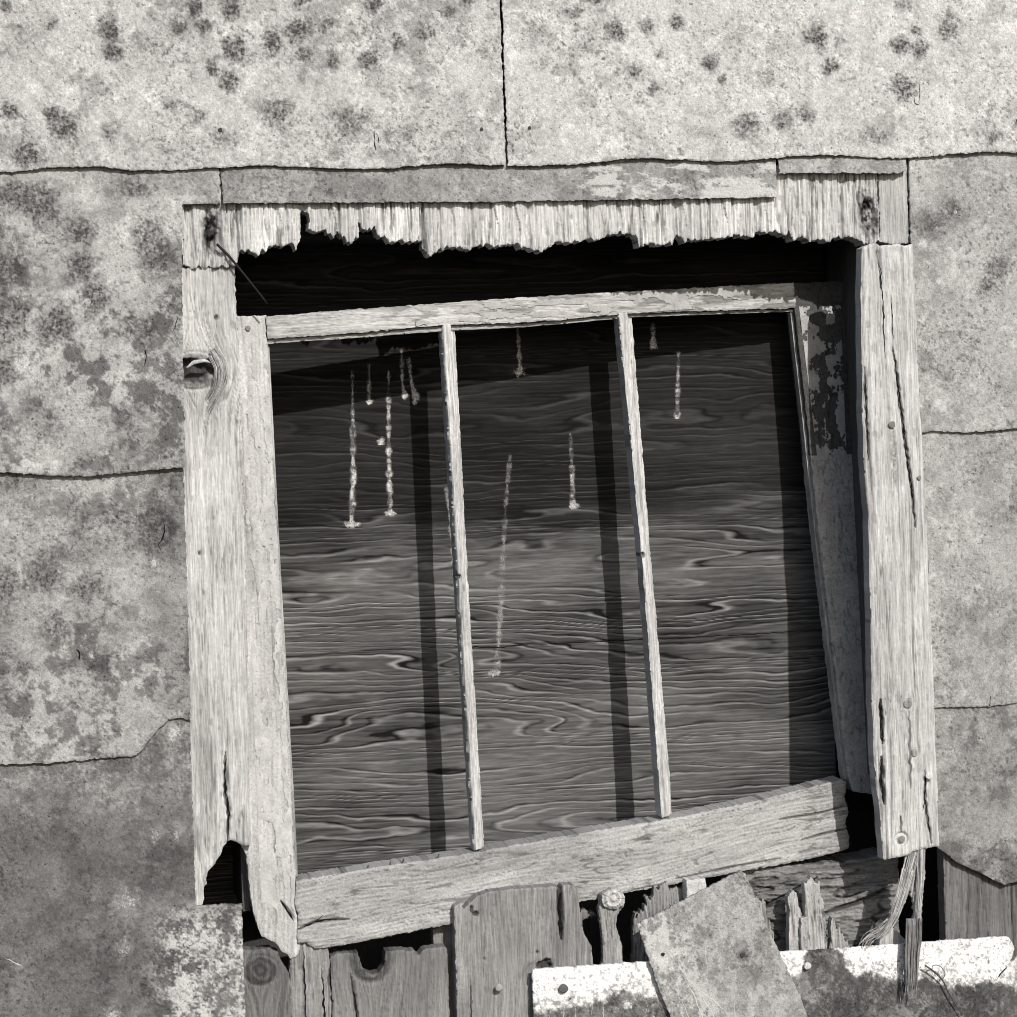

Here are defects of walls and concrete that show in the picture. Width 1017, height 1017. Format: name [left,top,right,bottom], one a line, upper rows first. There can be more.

water stain [207,37,245,90]
water stain [264,19,311,62]
water stain [805,27,827,49]
water stain [890,26,928,58]
water stain [44,107,78,142]
water stain [16,143,43,167]
water stain [66,220,110,318]
water stain [401,360,419,405]
peeling [799,305,847,461]
crack [864,252,916,524]
water stain [378,398,396,515]
water stain [346,448,359,527]